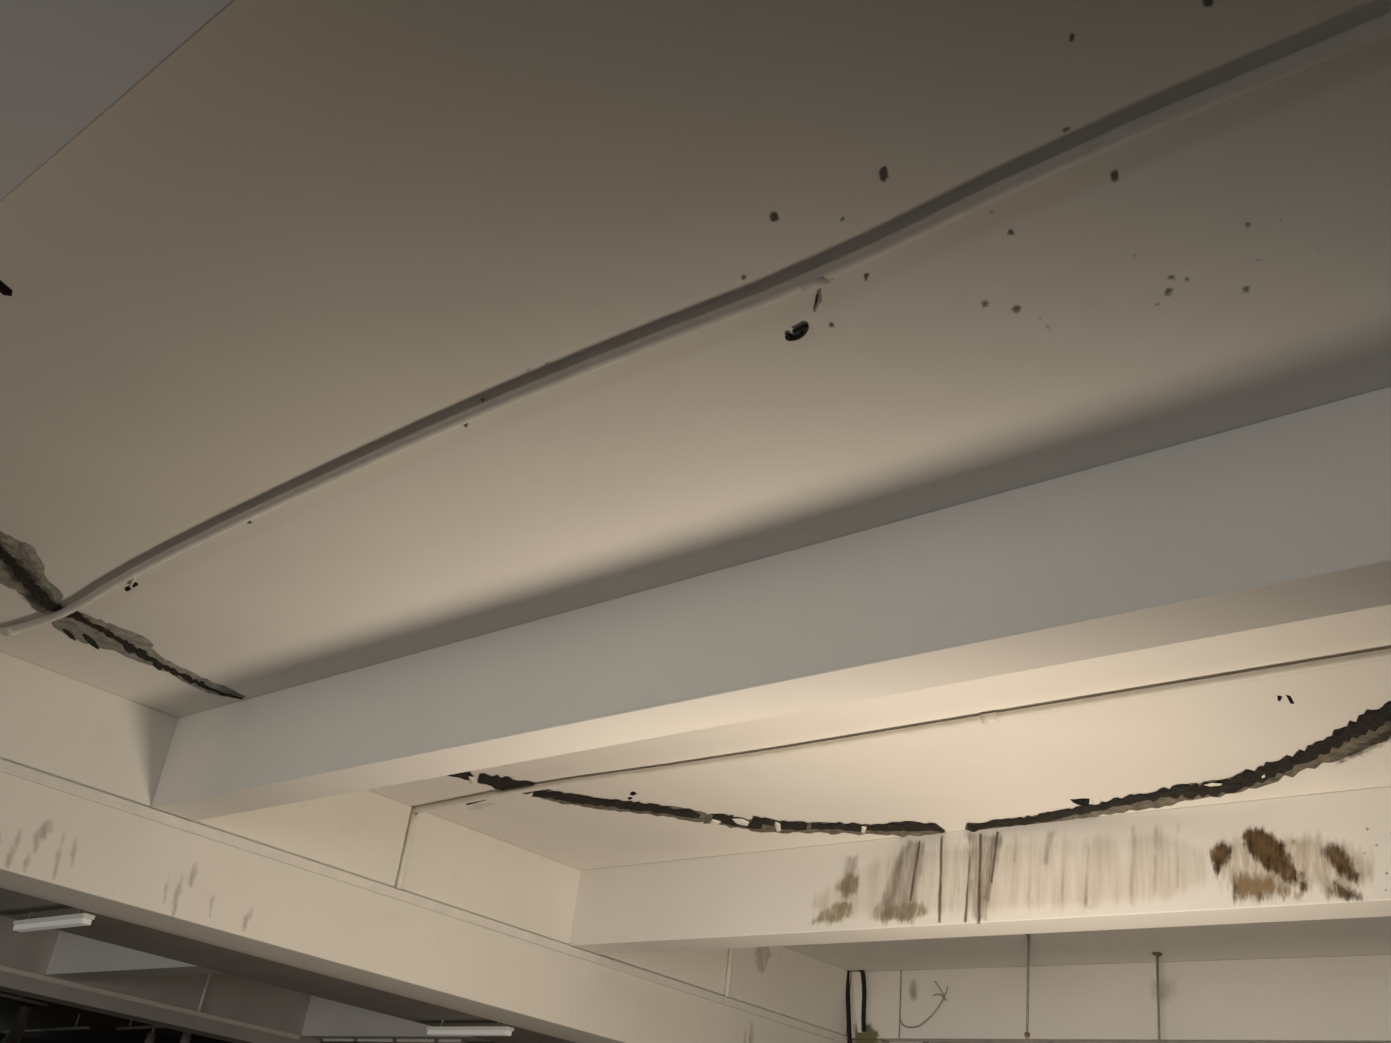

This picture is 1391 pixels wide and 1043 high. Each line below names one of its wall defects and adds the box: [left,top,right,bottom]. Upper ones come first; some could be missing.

crack [0,531,246,700]
crack [447,703,1391,837]
corrosion [1210,828,1307,899]
corrosion [1321,844,1359,901]